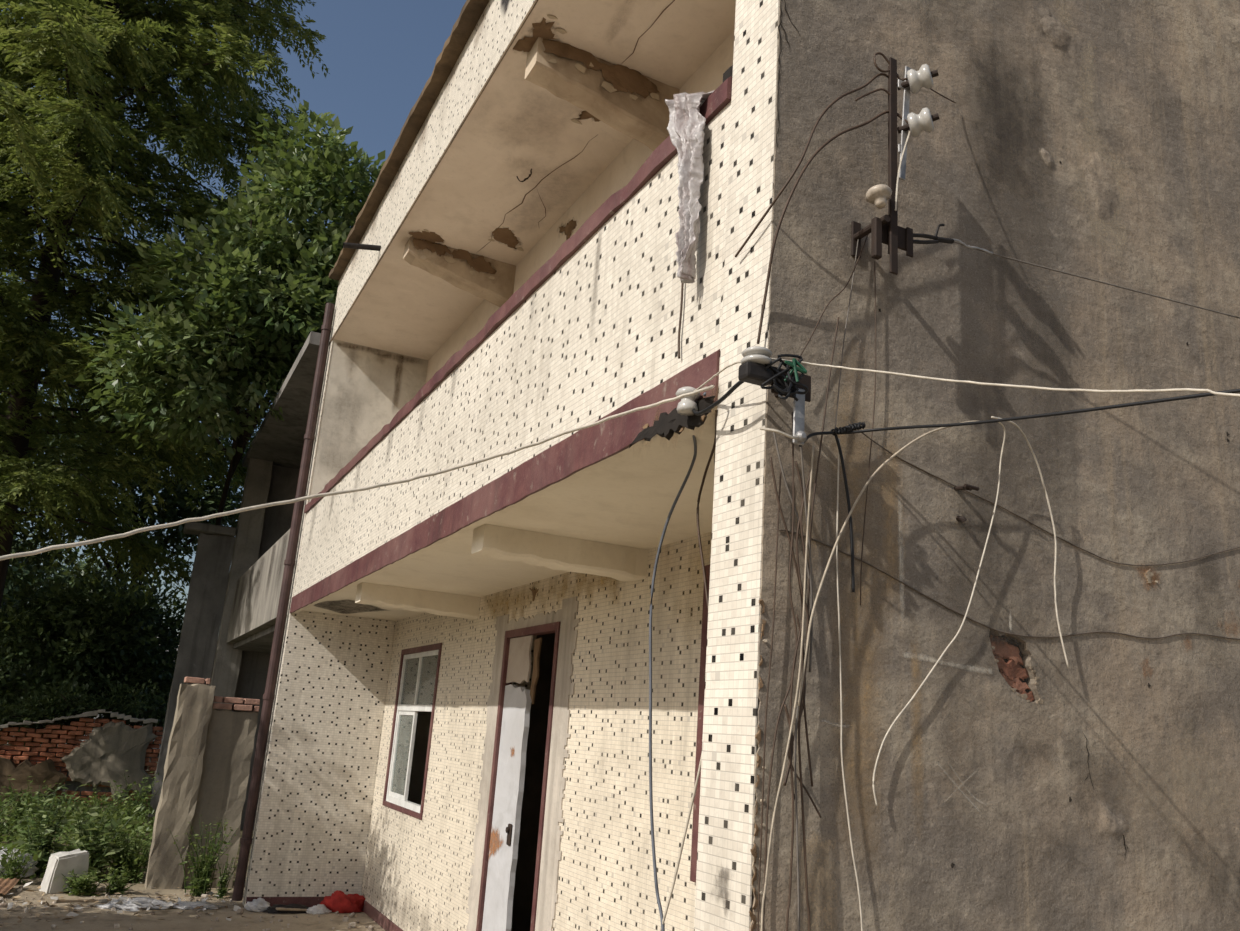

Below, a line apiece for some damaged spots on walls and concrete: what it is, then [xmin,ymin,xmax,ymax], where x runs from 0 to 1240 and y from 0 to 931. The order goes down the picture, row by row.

spalling [513,15,660,101]
crack [620,0,675,65]
crack [478,135,597,252]
spalling [408,229,497,280]
spalling [488,227,524,251]
flaking render [989,628,1043,704]